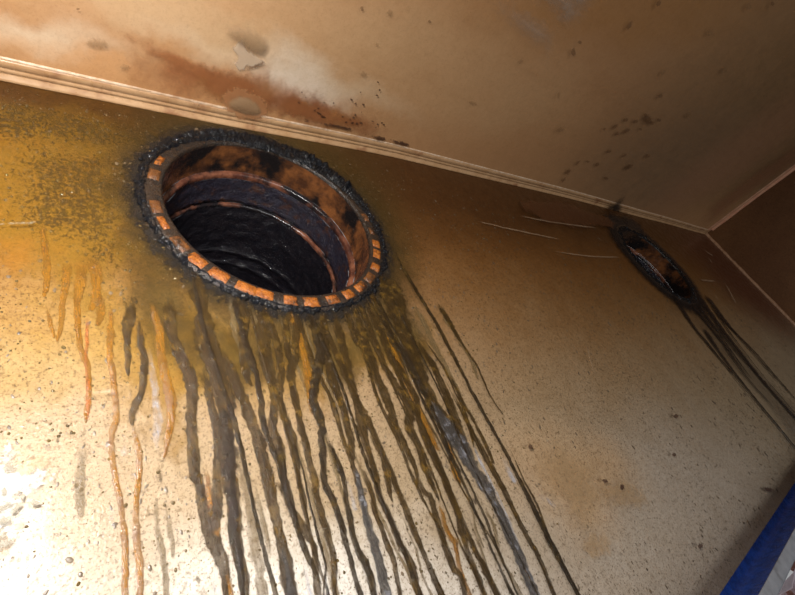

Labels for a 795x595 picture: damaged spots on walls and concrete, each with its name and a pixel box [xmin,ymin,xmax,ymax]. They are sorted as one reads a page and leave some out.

peeling [234,42,264,69]
corrosion [156,54,368,126]
damp [47,255,581,595]
damp [673,291,795,448]